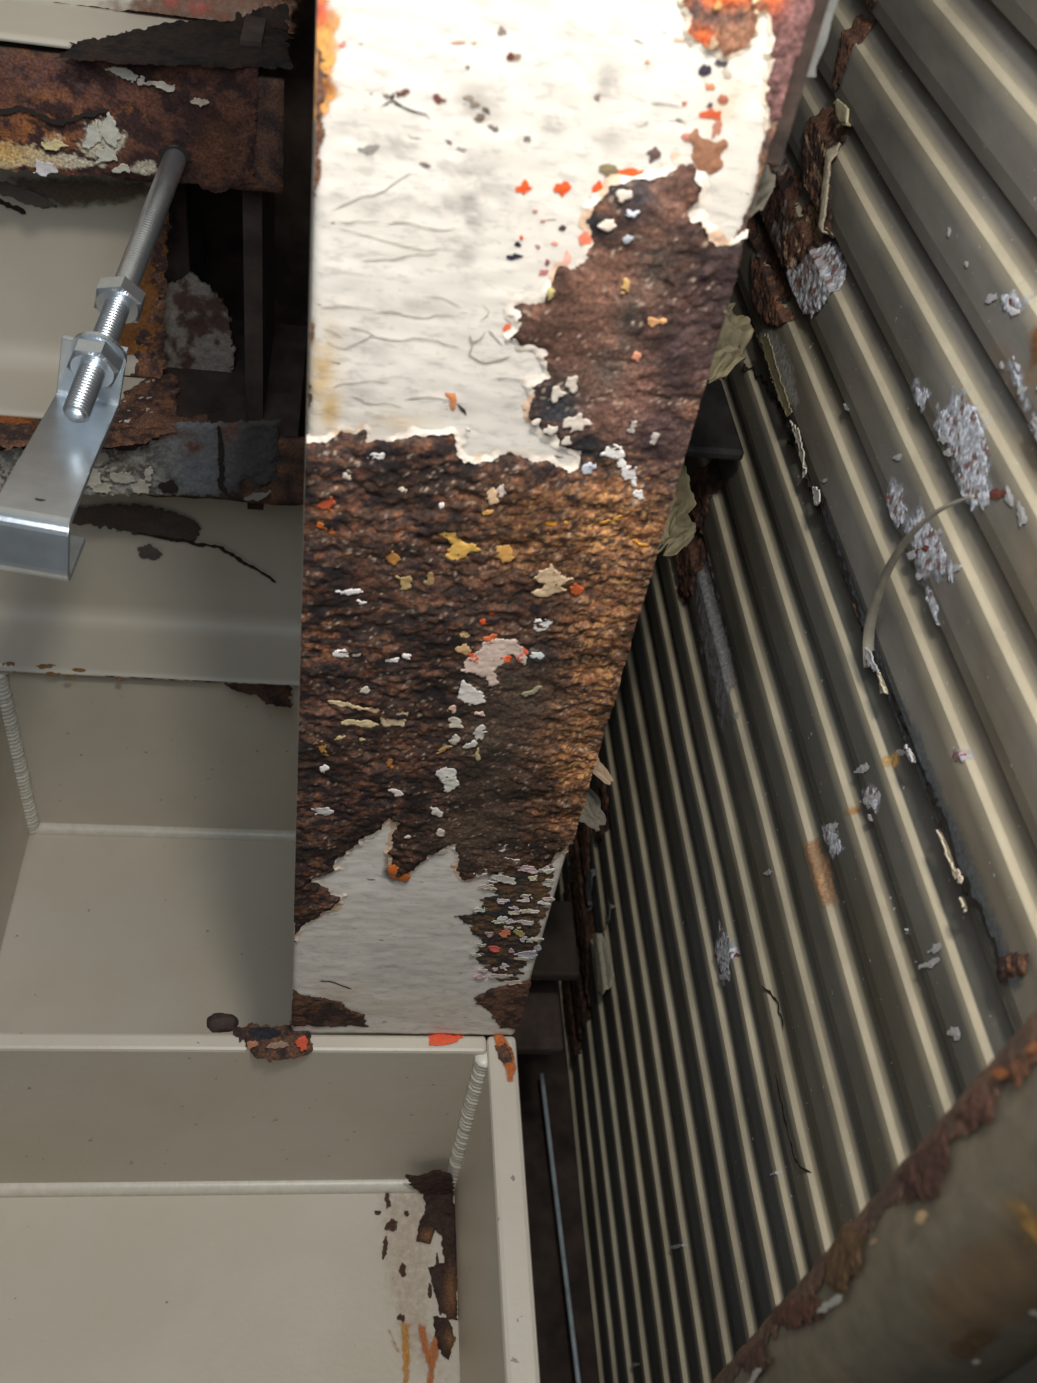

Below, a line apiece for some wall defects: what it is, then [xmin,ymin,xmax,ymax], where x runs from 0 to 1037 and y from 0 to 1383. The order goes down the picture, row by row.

corrosion [0,0,295,421]
crack [331,172,461,261]
peeling [506,210,593,275]
peeling [589,146,661,198]
peeling [681,60,732,175]
corrosion [0,416,34,450]
crack [332,380,462,408]
crack [320,296,523,381]
corrosion [103,0,876,1082]
peeling [454,841,556,986]
corrosion [711,1011,1037,1383]
corrosion [374,1170,458,1383]